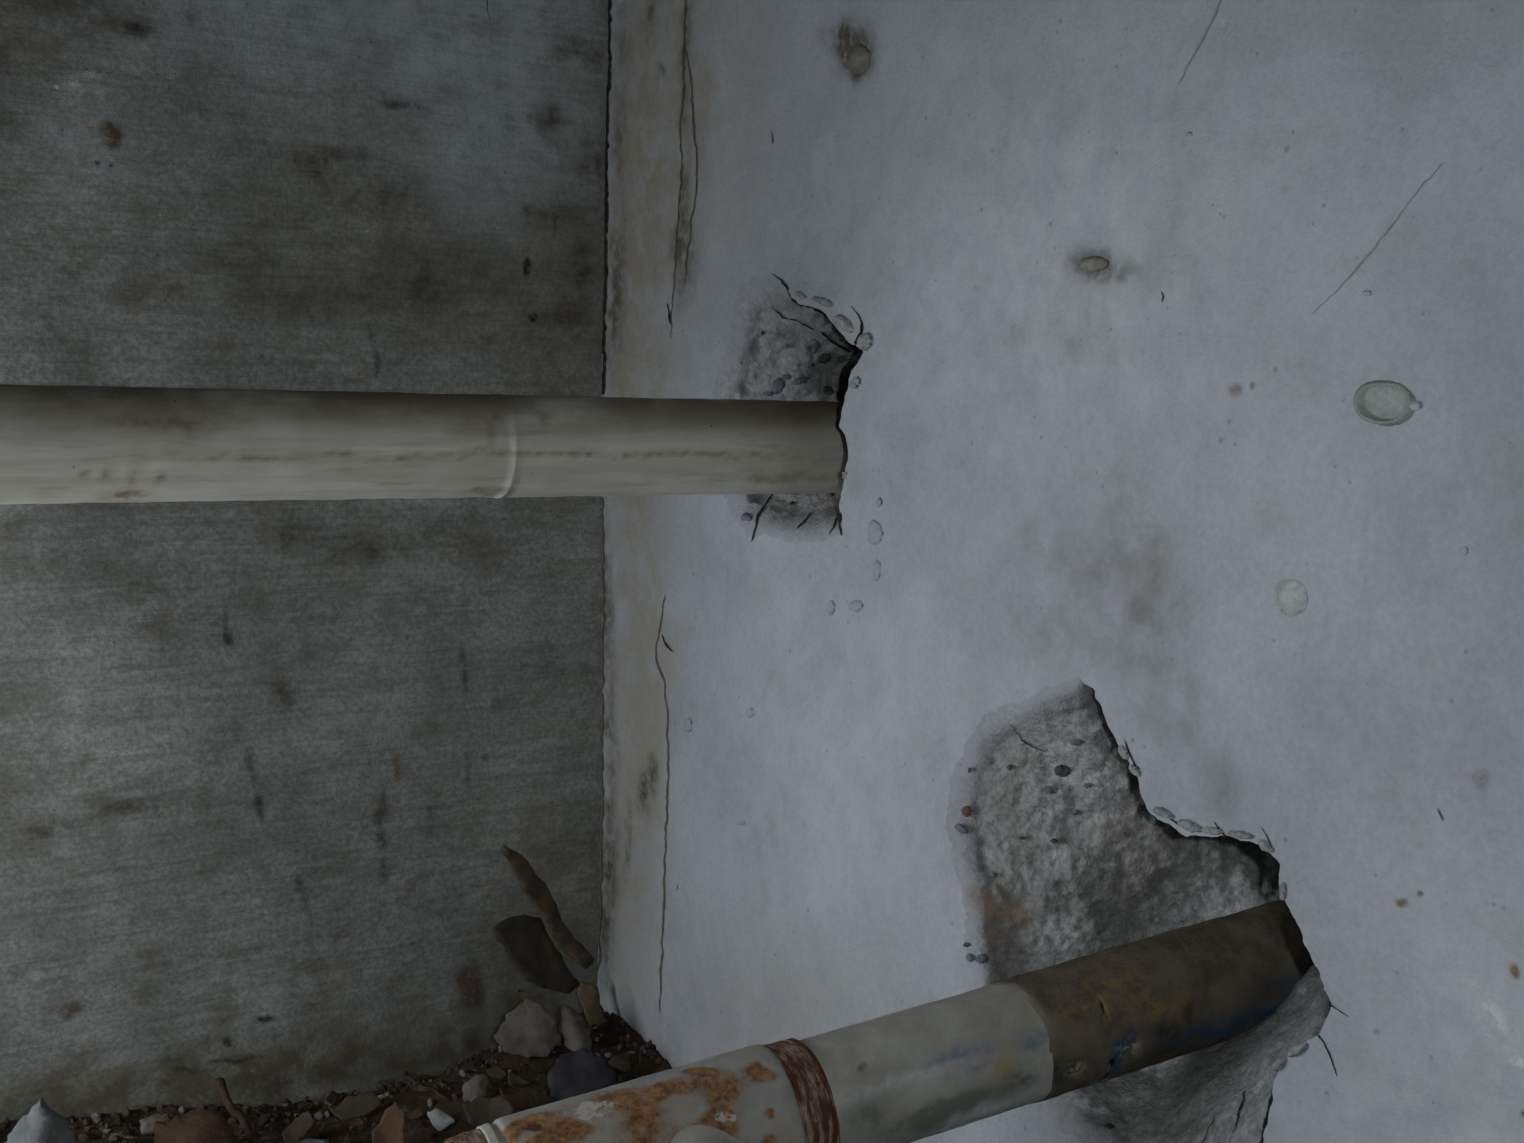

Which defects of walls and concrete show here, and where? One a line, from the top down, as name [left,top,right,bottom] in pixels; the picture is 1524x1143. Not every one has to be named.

crack [601,0,612,395]
crack [667,0,698,336]
spalling [711,273,874,402]
spalling [722,472,847,545]
crack [655,597,673,1011]
spalling [946,675,1287,989]
spalling [1027,965,1332,1143]
crack [1317,1005,1348,1076]